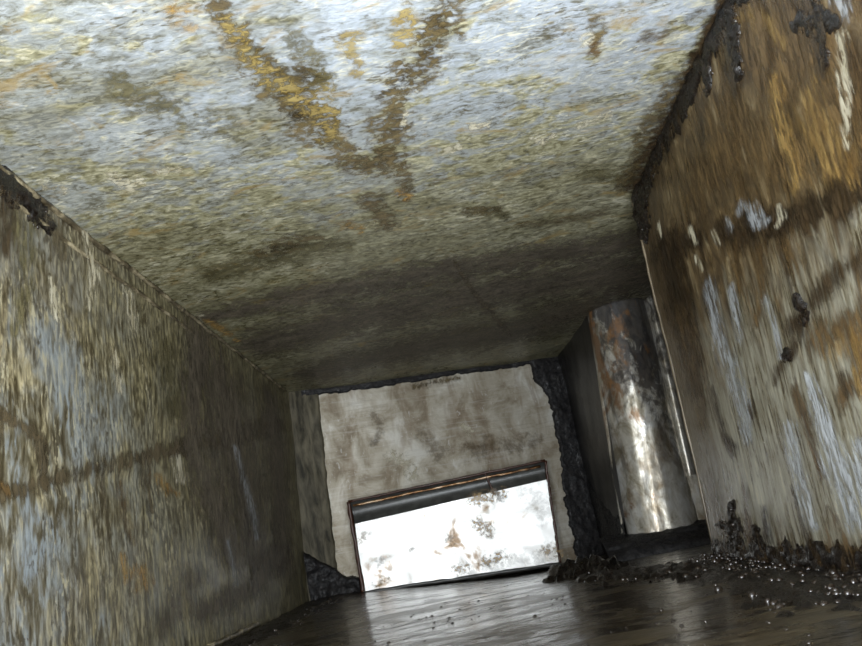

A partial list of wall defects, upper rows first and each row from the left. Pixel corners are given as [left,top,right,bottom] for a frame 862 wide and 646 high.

rust [204,0,357,167]
rust [336,31,364,78]
rust [363,0,466,161]
rust [677,0,862,221]
peeling [838,37,849,148]
peeling [738,203,766,227]
leakage [159,178,862,639]